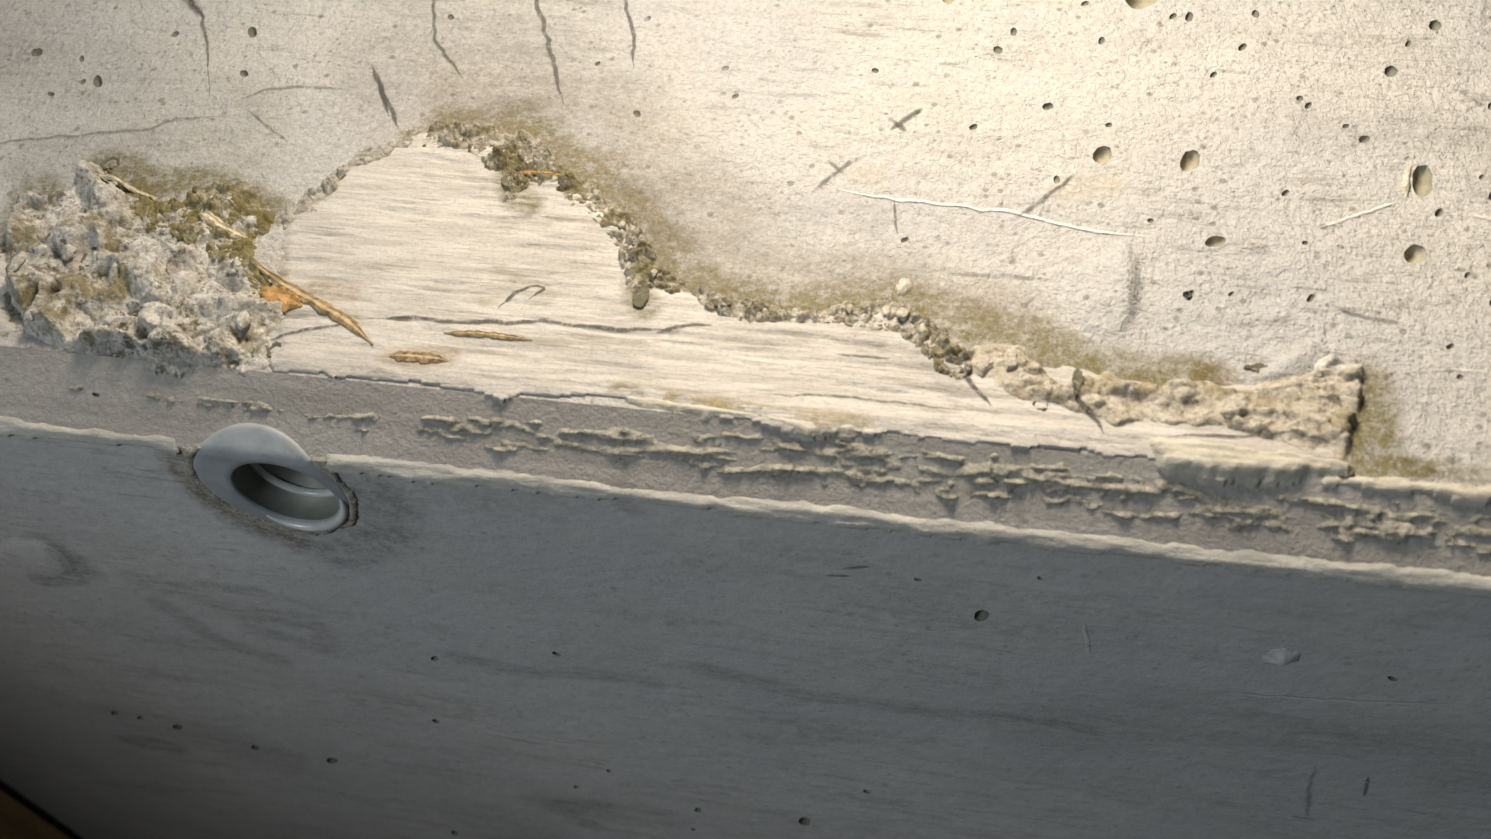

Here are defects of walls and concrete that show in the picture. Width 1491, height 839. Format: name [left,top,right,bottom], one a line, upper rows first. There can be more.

spalling [100,156,120,170]
spalling [0,242,18,336]
spalling [266,120,1367,488]